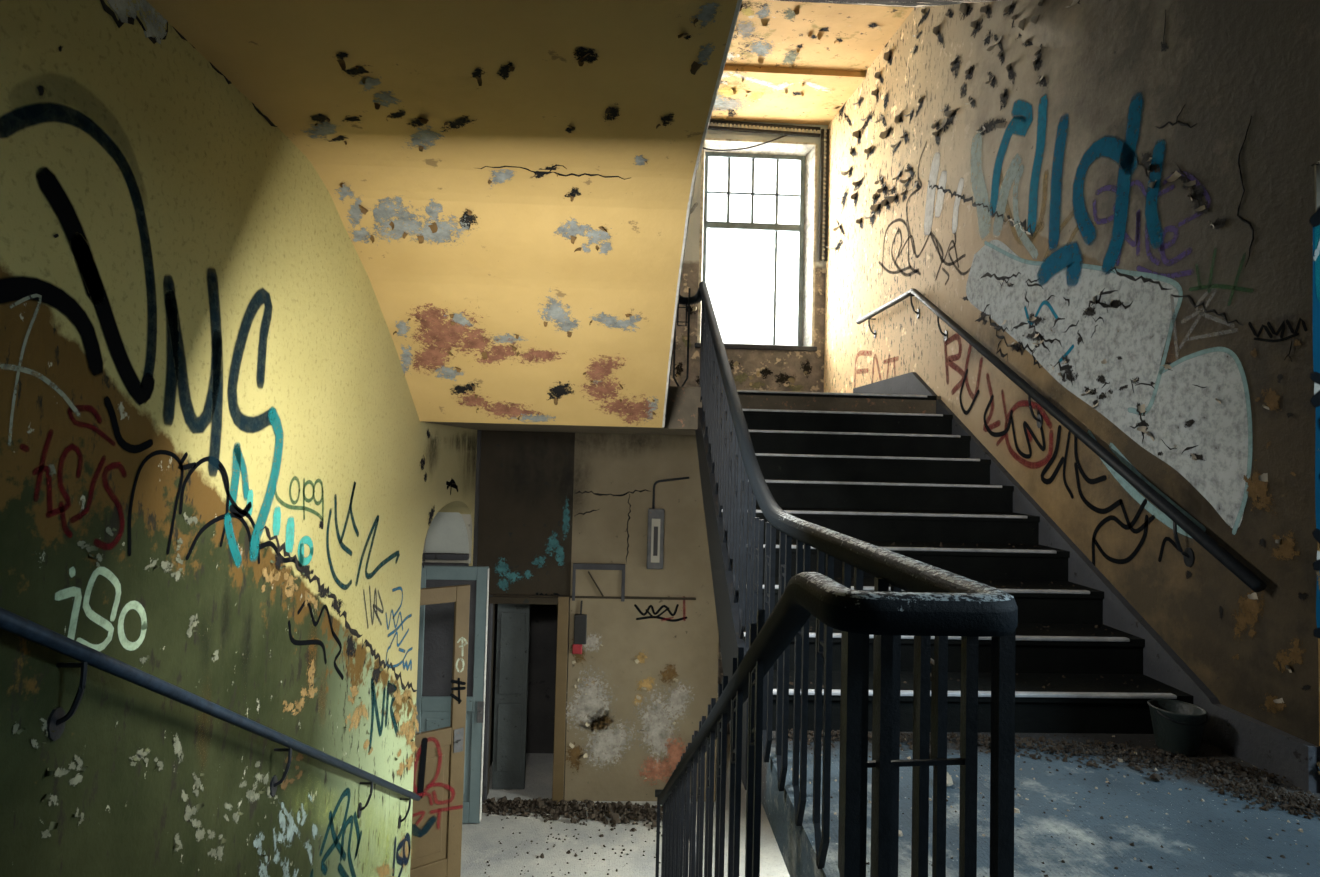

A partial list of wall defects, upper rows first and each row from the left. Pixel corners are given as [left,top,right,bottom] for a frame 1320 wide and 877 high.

peeling [302,52,475,152]
peeling [678,0,1049,253]
crack [478,165,629,180]
peeling [335,183,478,245]
peeling [554,187,613,255]
peeling [393,291,659,427]
peeling [1081,356,1155,409]
peeling [143,512,198,582]
crack [575,489,648,563]
flaking render [566,631,695,786]
peeling [129,732,184,771]
peeling [174,752,323,877]